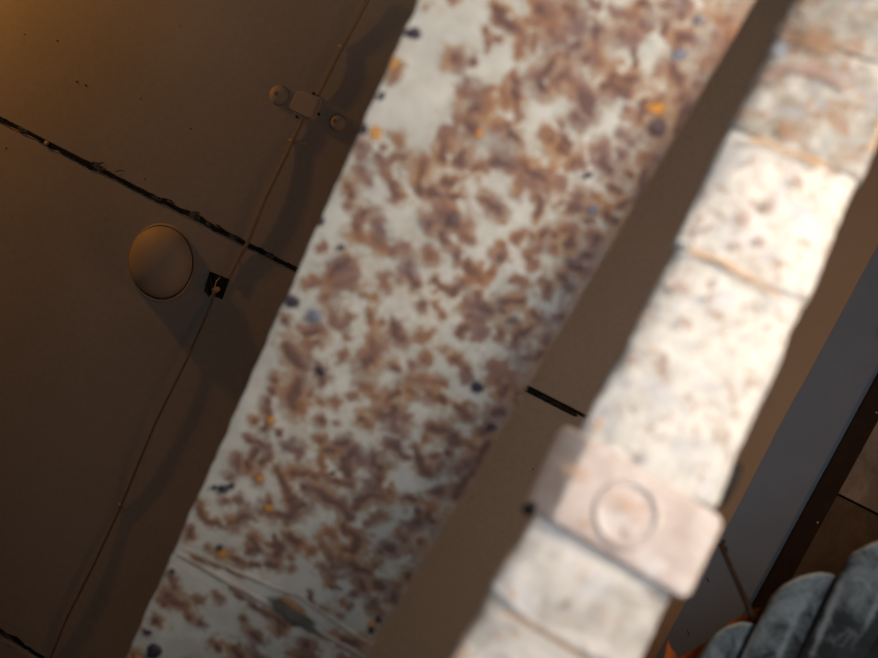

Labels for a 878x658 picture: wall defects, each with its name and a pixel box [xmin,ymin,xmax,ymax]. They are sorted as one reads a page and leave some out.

crack [0,118,299,273]
rust [141,0,755,658]
crack [525,387,577,417]
crack [0,629,44,658]